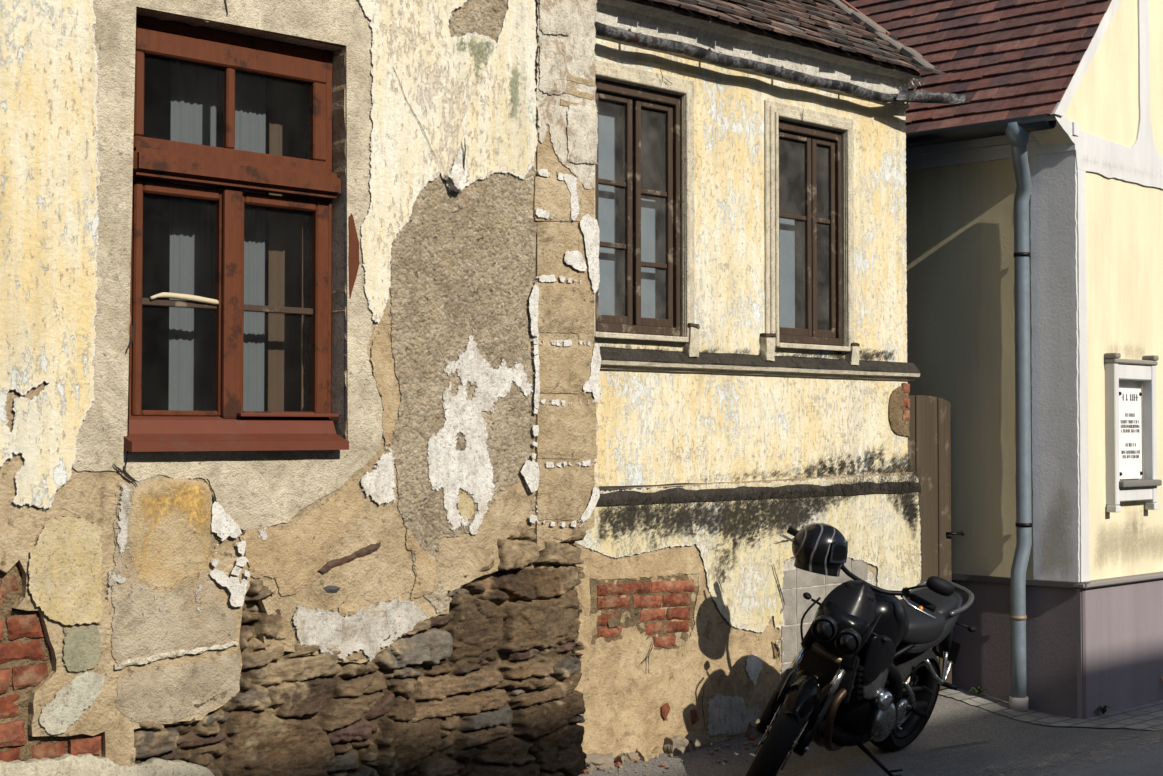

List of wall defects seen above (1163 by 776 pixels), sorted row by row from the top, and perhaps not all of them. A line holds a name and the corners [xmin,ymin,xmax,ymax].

spalling [449,0,508,43]
spalling [290,146,602,662]
damp [599,447,922,581]
spalling [888,383,910,436]
peeling [0,516,166,762]
spalling [575,542,780,758]